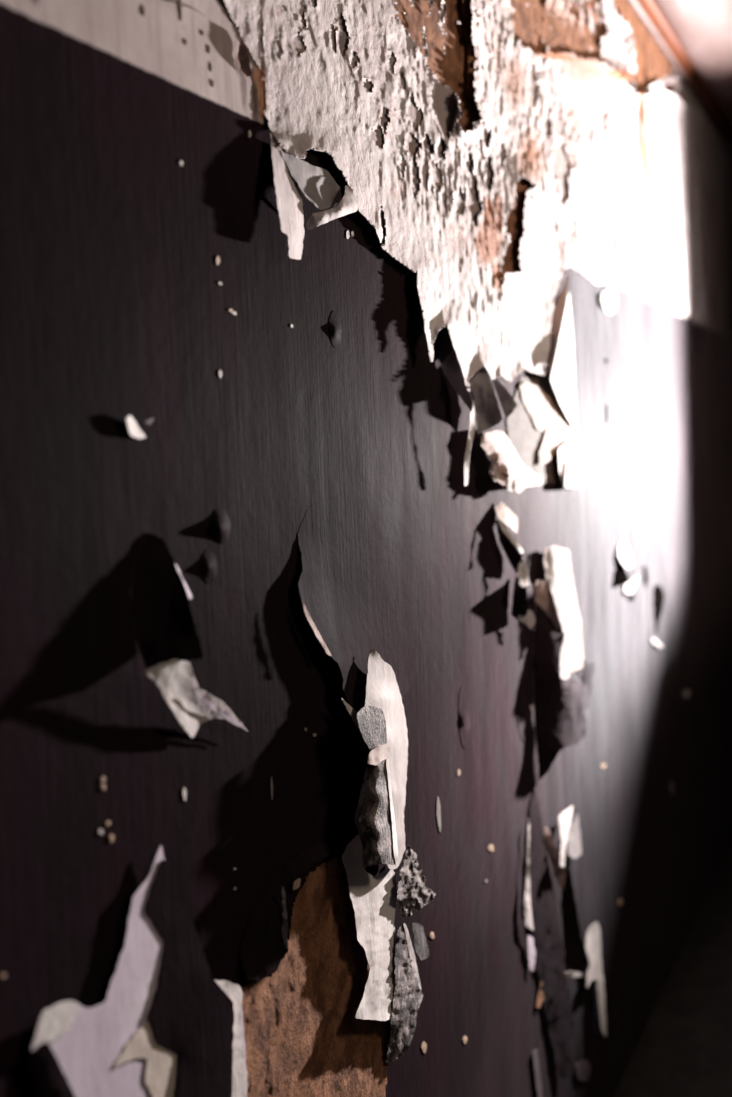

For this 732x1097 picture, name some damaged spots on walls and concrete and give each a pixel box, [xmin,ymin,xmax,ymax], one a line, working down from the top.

peeling [223,0,705,488]
peeling [130,533,248,738]
peeling [495,520,595,708]
peeling [30,845,179,1097]
flaking render [236,835,436,1097]